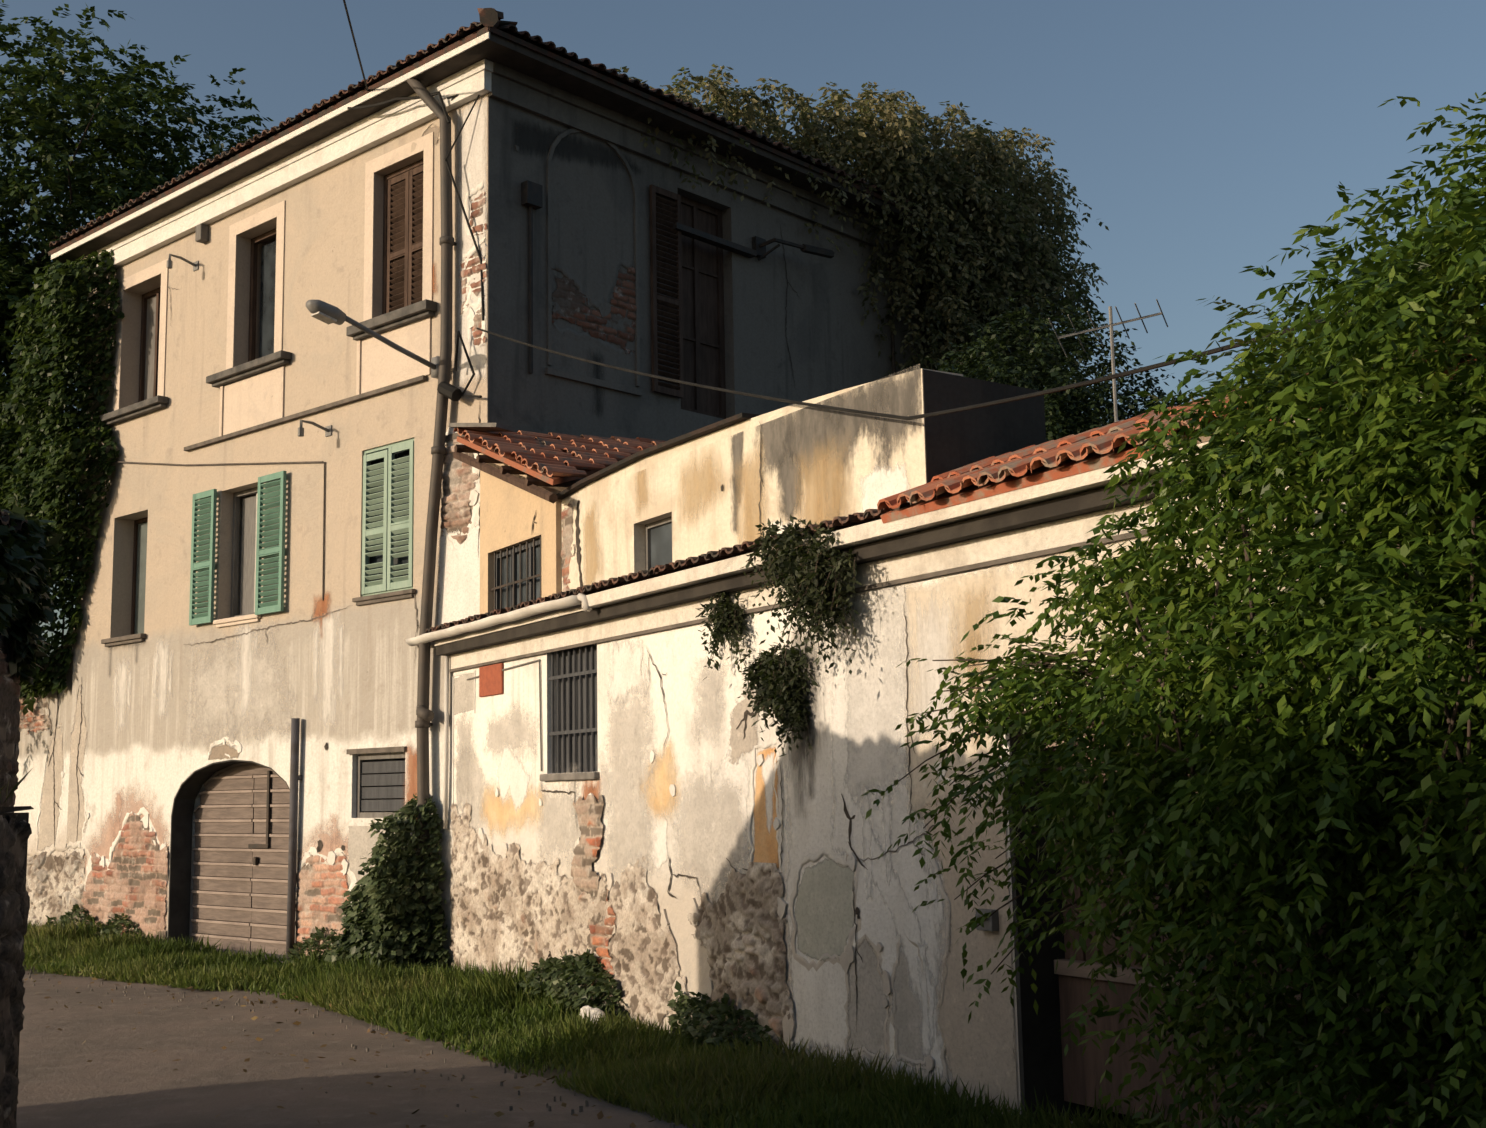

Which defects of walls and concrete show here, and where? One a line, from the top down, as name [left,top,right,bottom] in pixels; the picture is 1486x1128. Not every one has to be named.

peeling [411,119,440,152]
peeling [458,100,487,383]
water stain [683,364,922,541]
water stain [109,638,172,728]
water stain [192,624,291,746]
water stain [313,613,343,723]
flaking render [0,626,169,1128]
flaking render [295,826,395,960]
flaking render [449,670,1018,1118]
crack [841,586,948,1032]